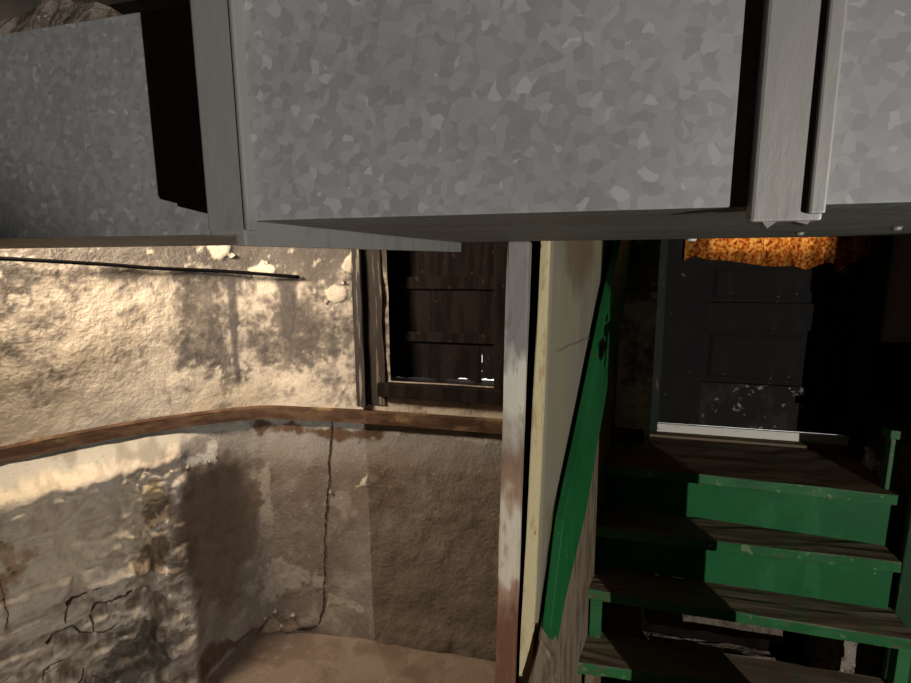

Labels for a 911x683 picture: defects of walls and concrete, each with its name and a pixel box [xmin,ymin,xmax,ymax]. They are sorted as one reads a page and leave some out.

leakage [170,275,351,382]
crack [261,422,333,631]
crack [0,580,9,638]
crack [42,586,132,681]